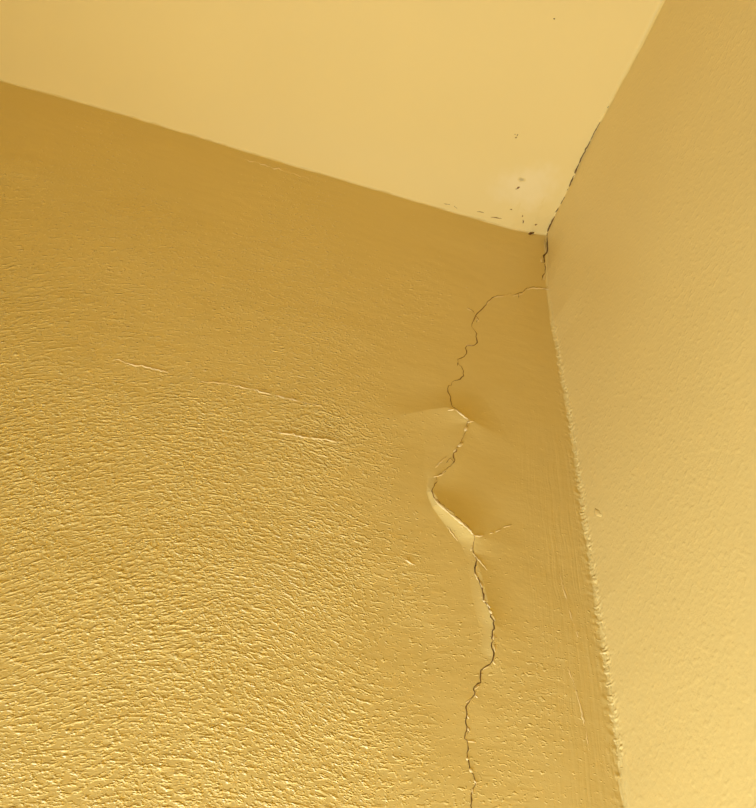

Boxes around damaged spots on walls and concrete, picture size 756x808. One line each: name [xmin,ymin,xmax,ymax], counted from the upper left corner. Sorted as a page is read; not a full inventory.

crack [431,106,609,808]